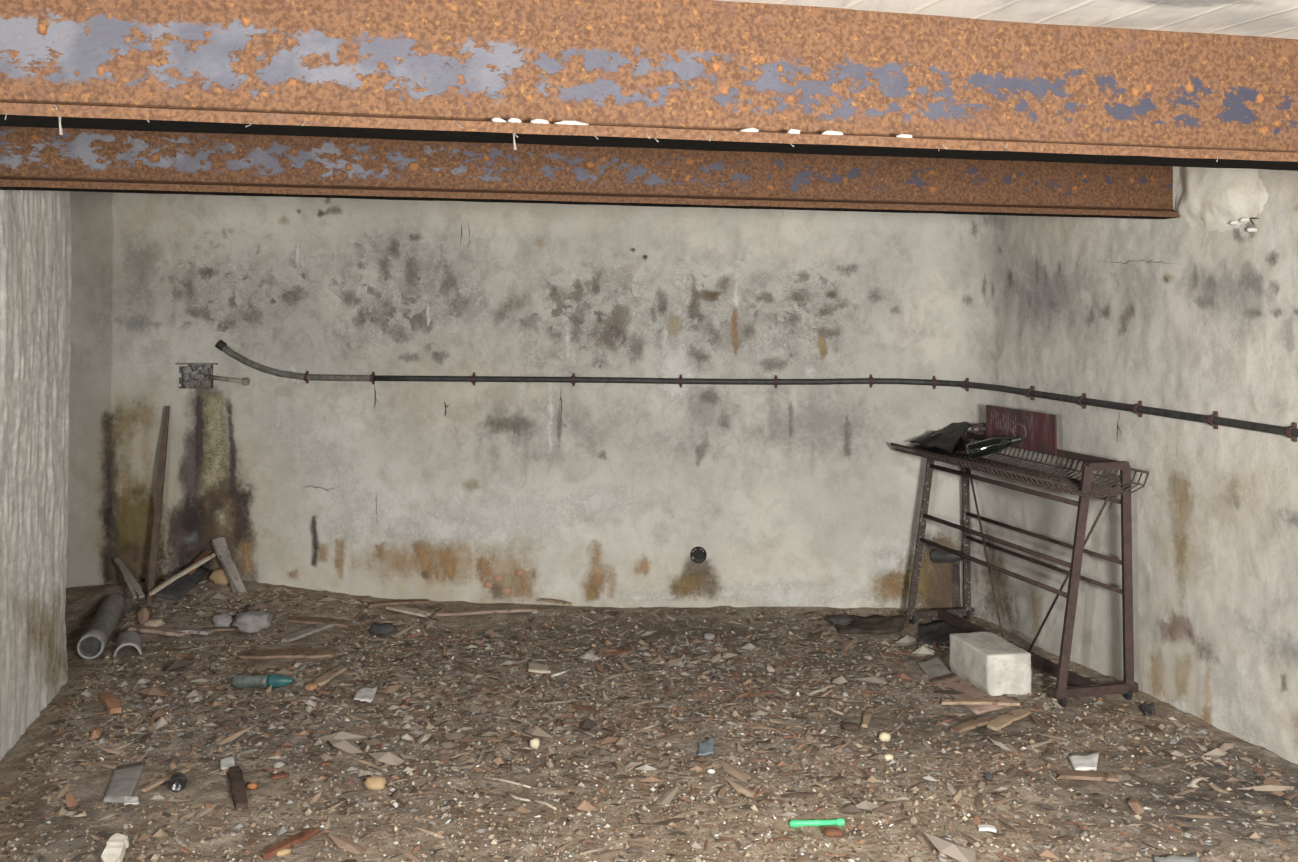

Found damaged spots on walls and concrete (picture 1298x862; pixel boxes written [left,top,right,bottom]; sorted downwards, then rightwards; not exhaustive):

water stain [551,277,754,402]
water stain [759,263,843,367]
water stain [168,392,255,581]
water stain [311,517,325,566]
water stain [626,561,868,607]
water stain [874,550,904,574]
water stain [918,534,960,609]
water stain [1169,701,1187,712]